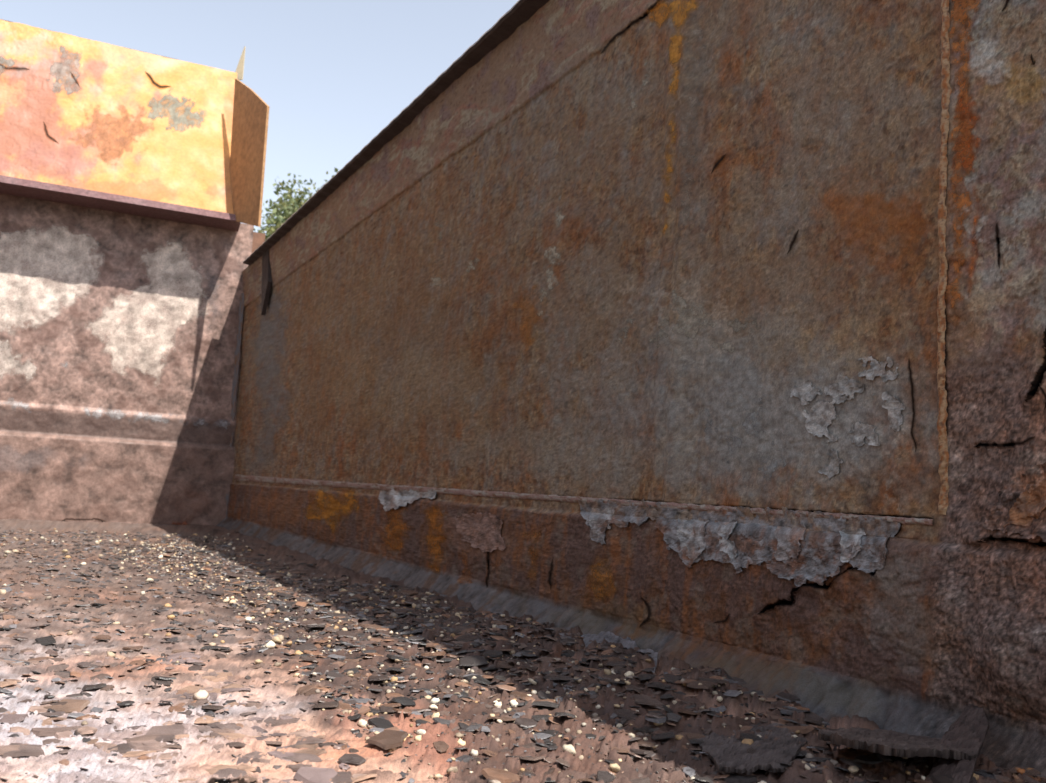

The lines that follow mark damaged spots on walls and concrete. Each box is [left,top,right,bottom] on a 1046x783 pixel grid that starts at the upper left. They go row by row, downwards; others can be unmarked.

rust [650,0,697,92]
peeling [148,94,204,132]
rust [945,0,981,325]
crack [944,0,952,440]
leakage [0,227,102,378]
leakage [90,242,215,376]
peeling [790,356,905,480]
crack [907,358,918,452]
crack [1024,325,1046,410]
peeling [378,488,436,511]
peeling [578,498,901,587]
crack [976,534,1046,549]